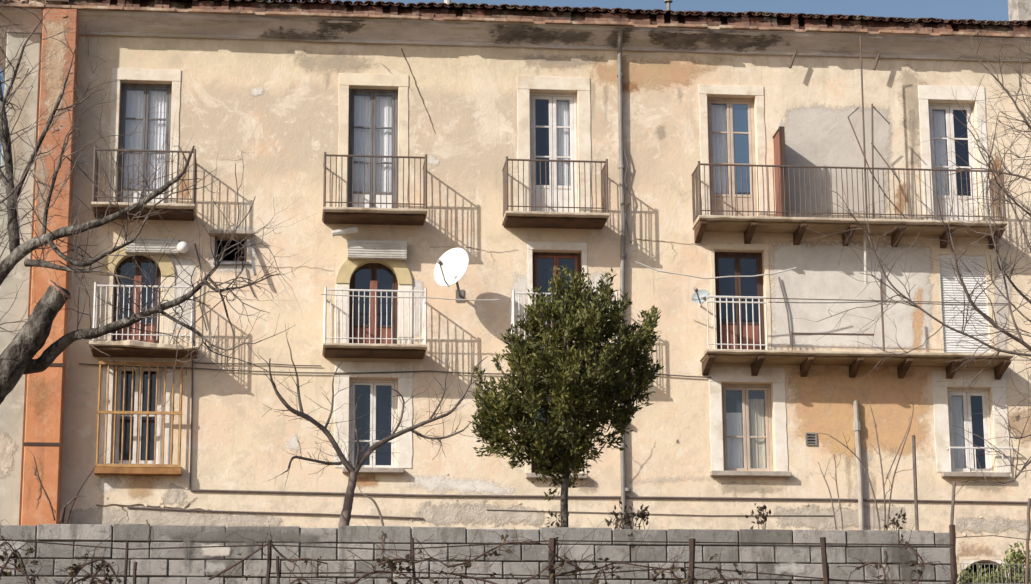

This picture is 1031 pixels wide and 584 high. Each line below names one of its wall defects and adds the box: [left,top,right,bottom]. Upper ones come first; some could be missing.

leakage [261,19,366,40]
crack [381,48,436,134]
leakage [489,24,790,92]
leakage [853,448,873,510]